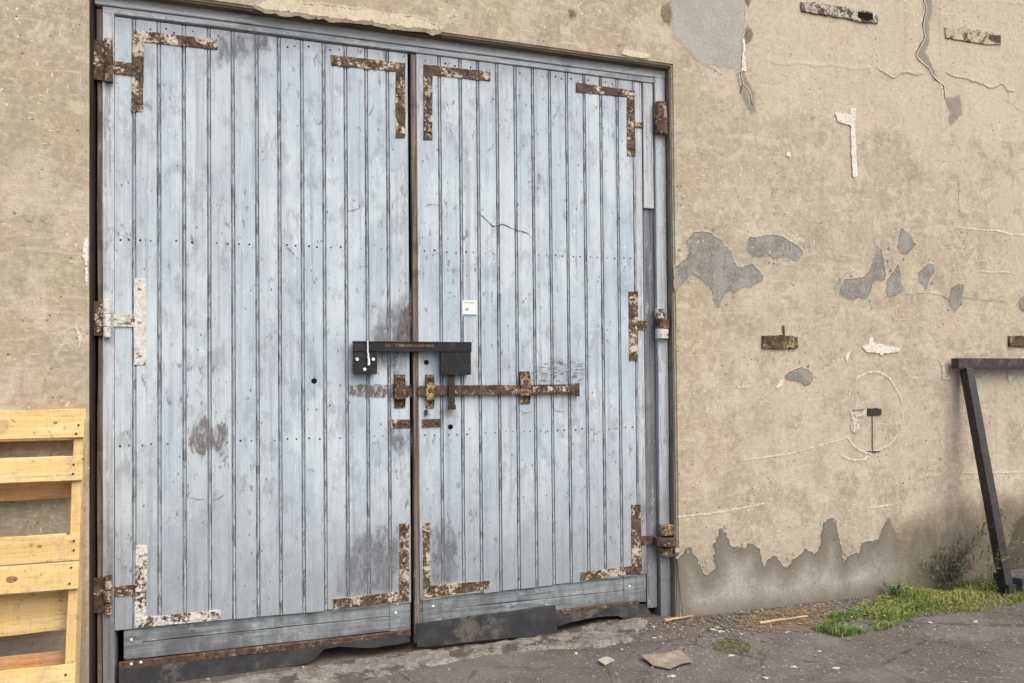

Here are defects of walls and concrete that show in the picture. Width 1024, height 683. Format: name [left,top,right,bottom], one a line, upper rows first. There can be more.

peeling [661,0,753,73]
crack [914,0,946,100]
crack [704,66,754,111]
flaking render [835,107,858,177]
peeling [673,227,804,309]
peeling [839,226,917,302]
peeling [947,283,966,313]
peeling [776,361,814,388]
peeling [675,516,889,617]